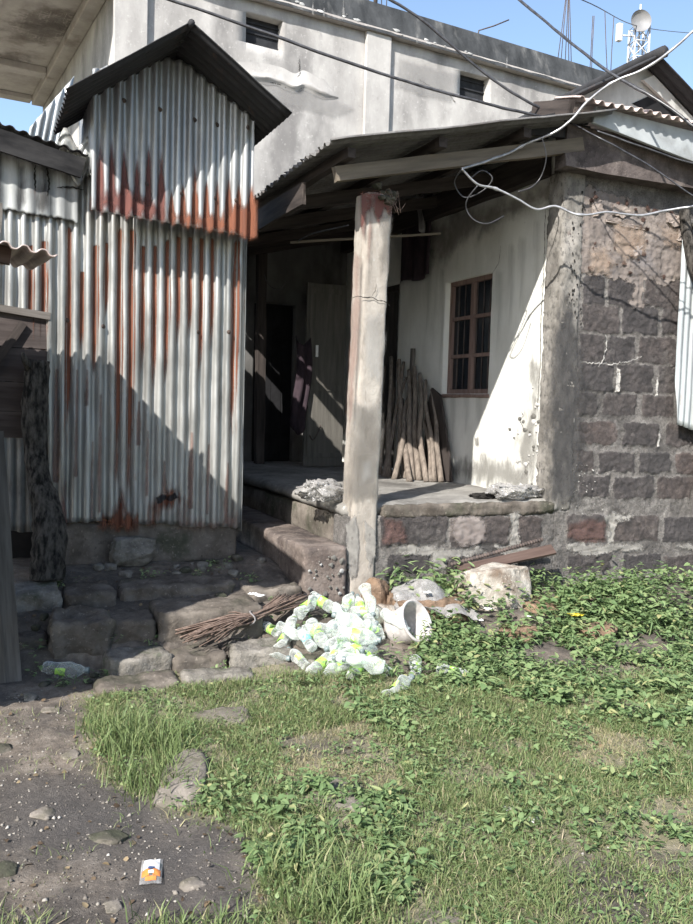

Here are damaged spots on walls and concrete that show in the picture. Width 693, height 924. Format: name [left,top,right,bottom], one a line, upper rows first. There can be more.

leakage [16,10,74,39]
corrosion [28,263,49,336]
corrosion [53,148,258,532]
crack [583,335,642,367]